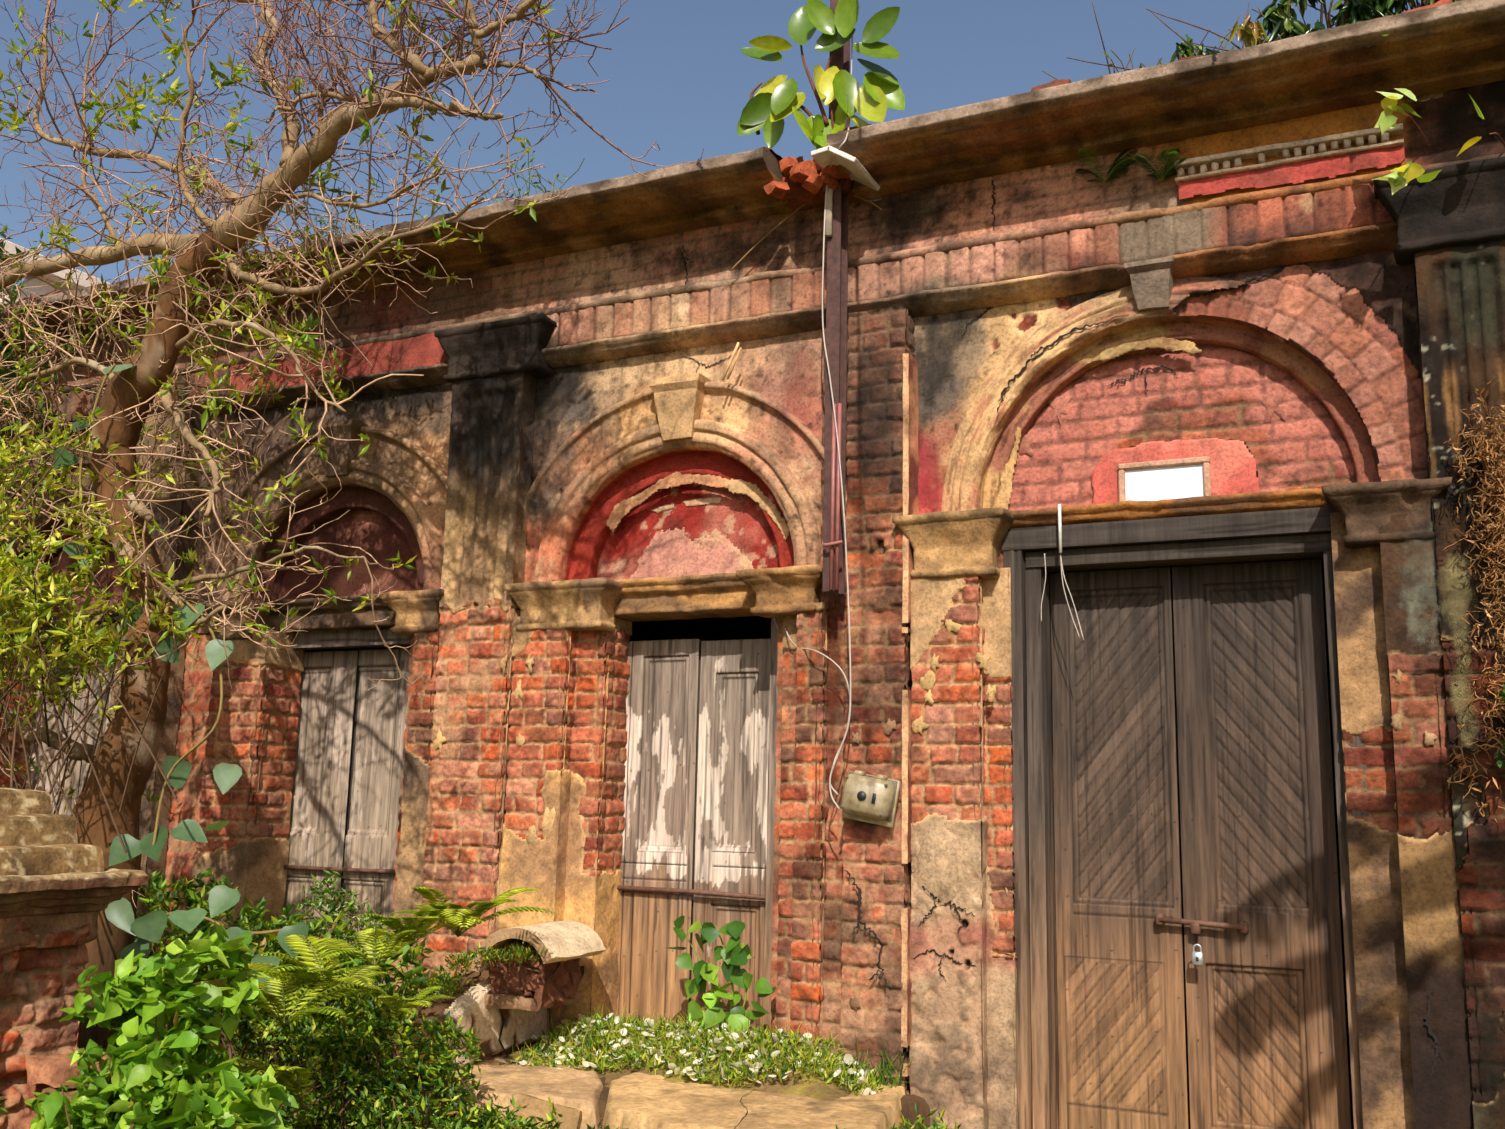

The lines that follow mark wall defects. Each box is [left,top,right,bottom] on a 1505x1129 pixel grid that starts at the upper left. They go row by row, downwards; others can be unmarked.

peeling [606,472,790,579]
flaking render [1012,313,1037,332]
flaking render [1057,297,1074,310]
flaking render [994,335,1357,511]
flaking render [1173,263,1428,482]
flaking render [406,598,631,992]
flaking render [776,305,1017,1086]
flaking render [1343,638,1505,1104]